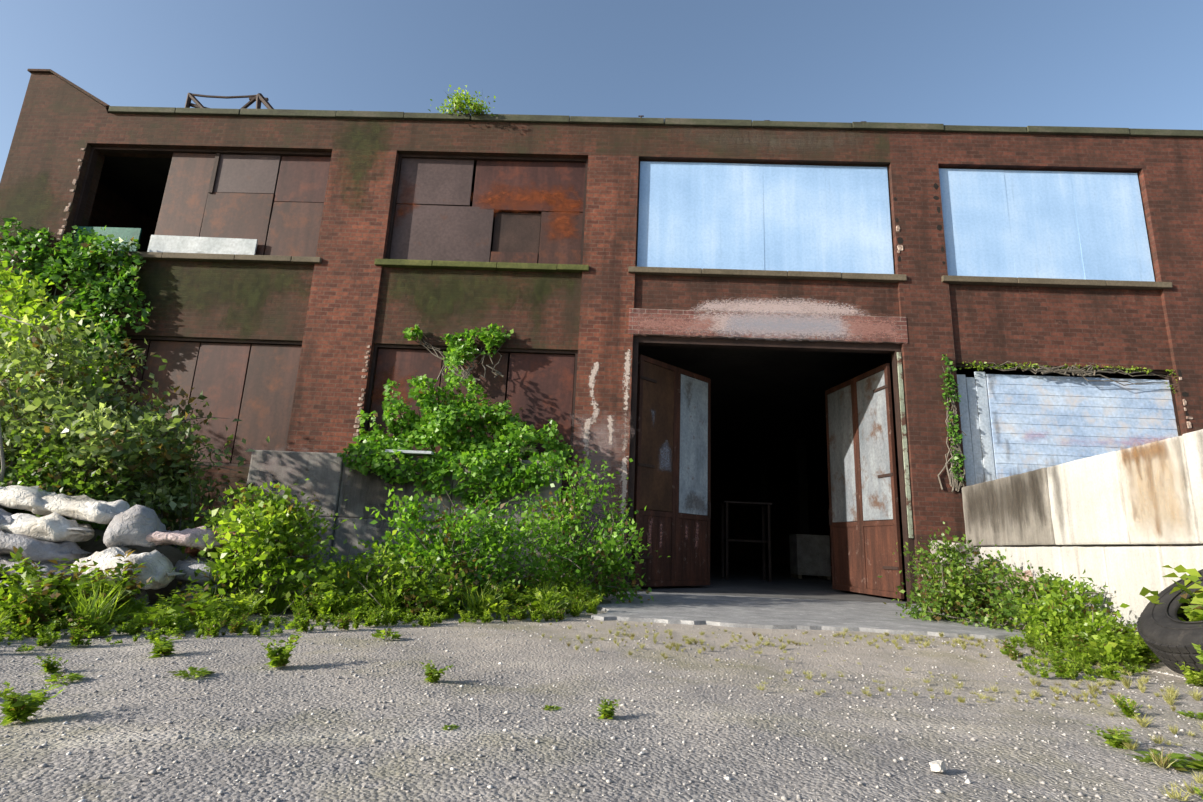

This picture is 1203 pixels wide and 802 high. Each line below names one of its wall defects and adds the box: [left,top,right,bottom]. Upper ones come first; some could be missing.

peeling [634,298,902,340]
leakage [580,362,614,481]
corrosion [1123,442,1164,477]